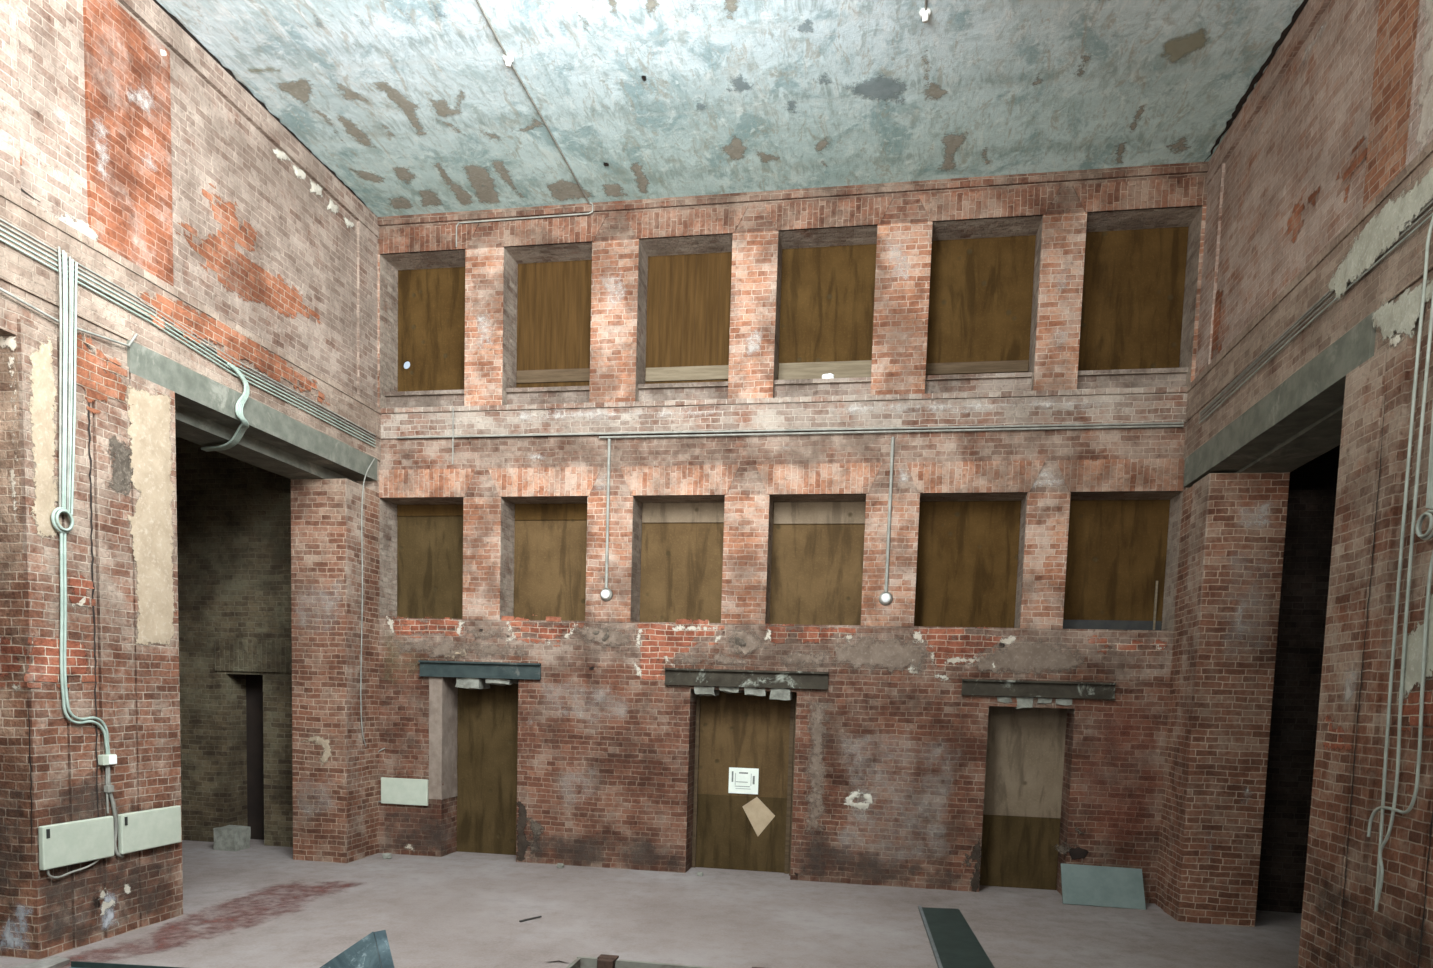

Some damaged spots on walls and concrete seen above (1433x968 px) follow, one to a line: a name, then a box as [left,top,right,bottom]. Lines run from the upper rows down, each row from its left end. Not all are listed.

peeling [680,0,738,19]
peeling [351,160,523,209]
peeling [547,162,649,201]
flaking render [174,183,321,323]
flaking render [132,286,330,406]
flaking render [501,614,858,680]